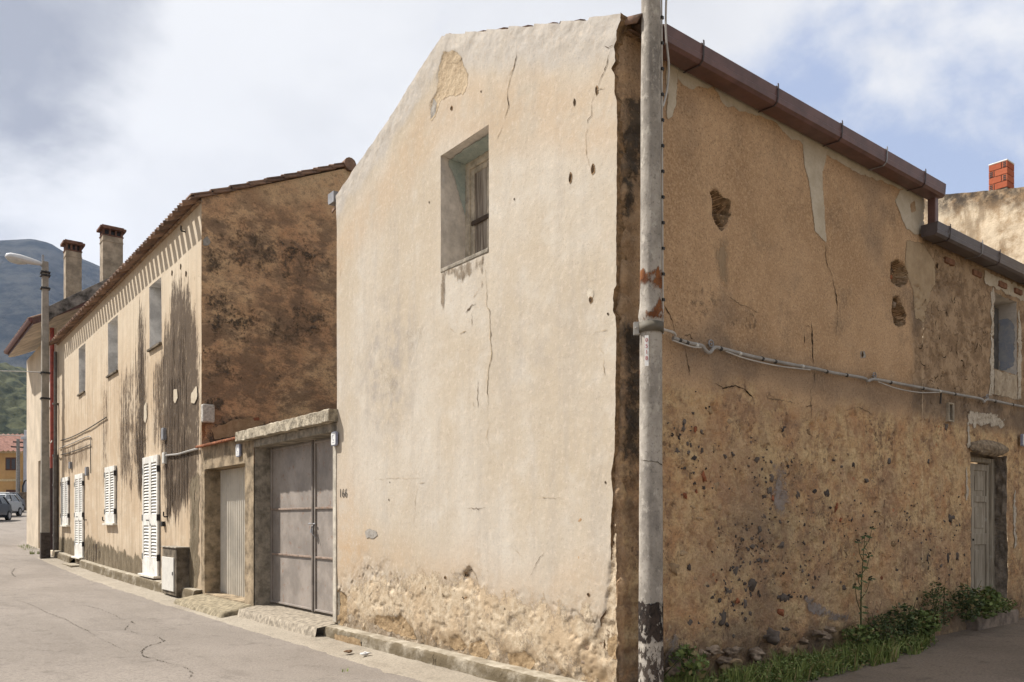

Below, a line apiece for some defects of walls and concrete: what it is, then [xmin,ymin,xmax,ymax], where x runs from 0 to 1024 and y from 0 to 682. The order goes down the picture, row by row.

spalling [430,50,468,121]
crack [497,53,517,137]
leakage [619,98,641,217]
peeling [666,64,939,327]
leakage [207,291,325,341]
leakage [204,222,329,286]
crack [450,276,492,406]
corrosion [640,266,663,318]
leakage [120,321,200,588]
peeling [967,411,1005,448]
spalling [334,524,618,682]